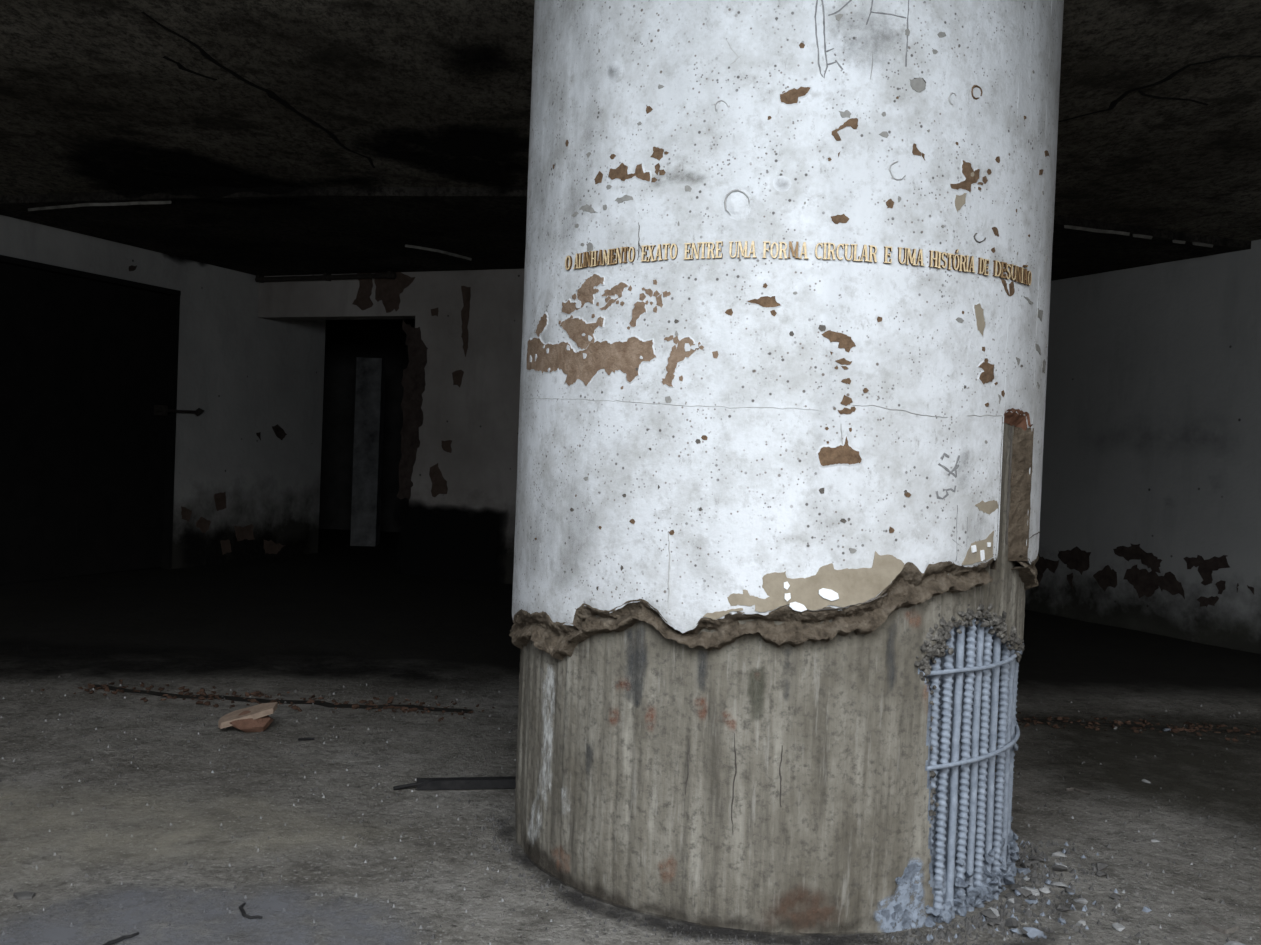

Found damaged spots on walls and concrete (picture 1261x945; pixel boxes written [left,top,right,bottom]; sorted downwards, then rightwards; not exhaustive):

crack [142,11,375,168]
peeling [779,85,812,106]
crack [1058,55,1261,122]
peeling [571,146,669,228]
peeling [949,156,1000,214]
peeling [452,286,471,387]
peeling [526,272,719,403]
peeling [429,440,452,497]
spalling [509,302,1254,933]